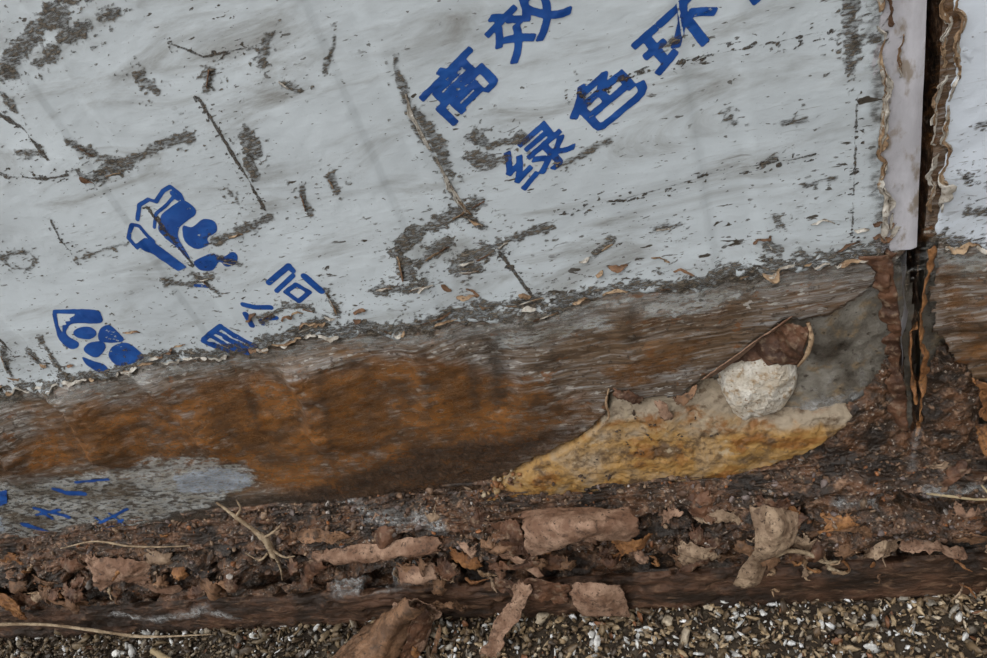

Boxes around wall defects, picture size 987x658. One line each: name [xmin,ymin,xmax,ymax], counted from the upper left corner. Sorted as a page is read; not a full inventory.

peeling [925,0,967,213]
spalling [0,0,920,502]
peeling [930,227,987,276]
rust [0,361,590,523]
rust [925,378,987,488]
rust [0,549,239,620]
rust [261,490,987,658]